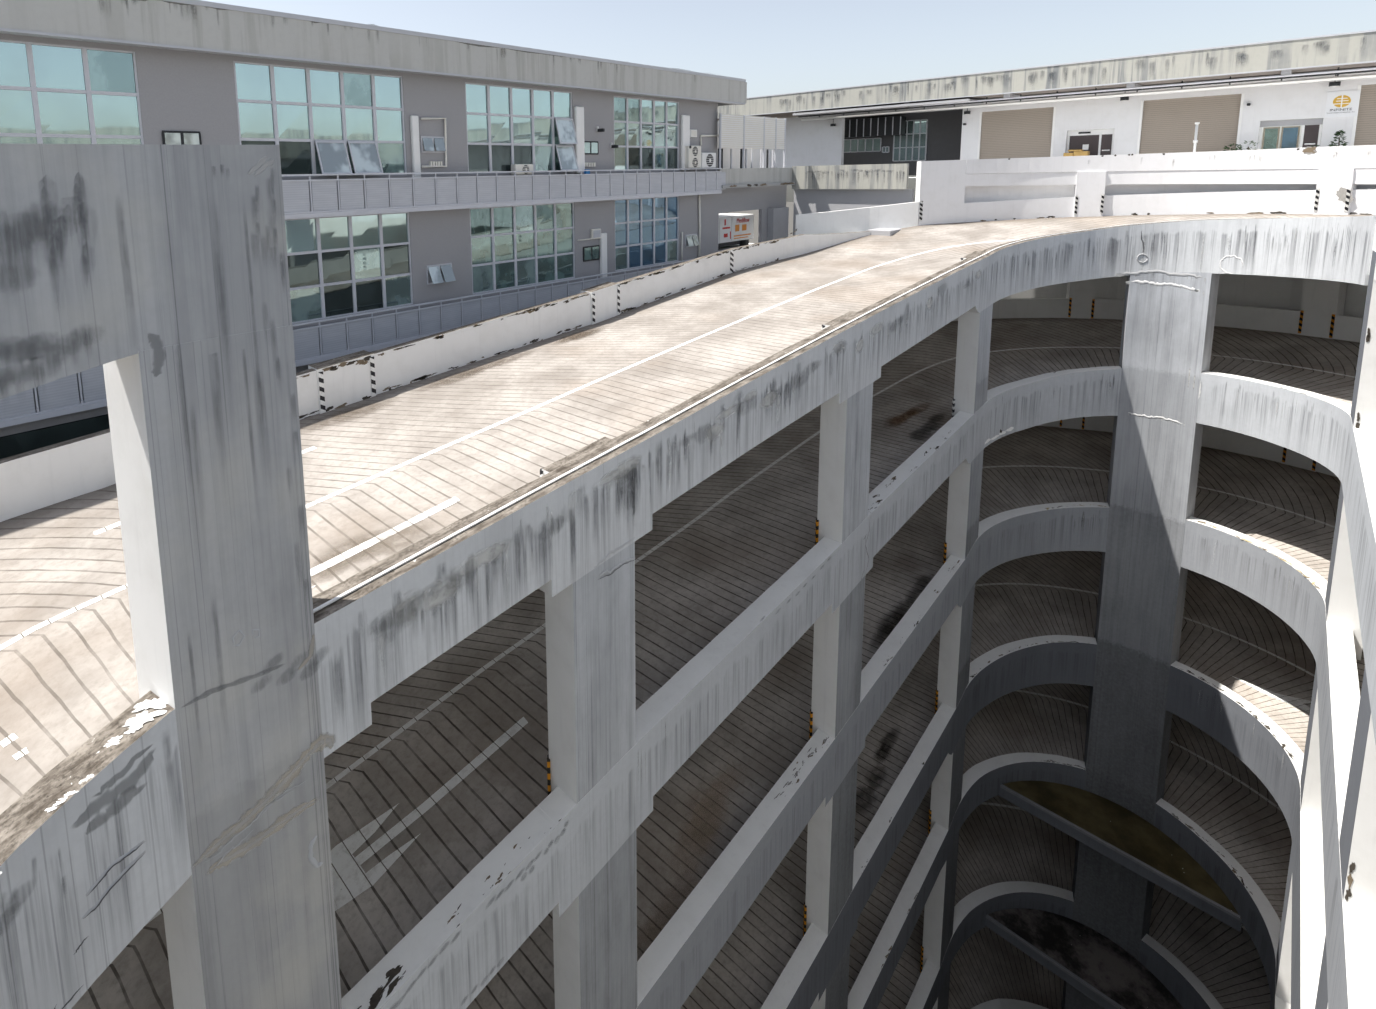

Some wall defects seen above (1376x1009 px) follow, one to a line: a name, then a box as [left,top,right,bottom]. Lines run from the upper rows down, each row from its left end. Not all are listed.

leakage [1116,270,1205,294]
peeling [358,965,406,1009]